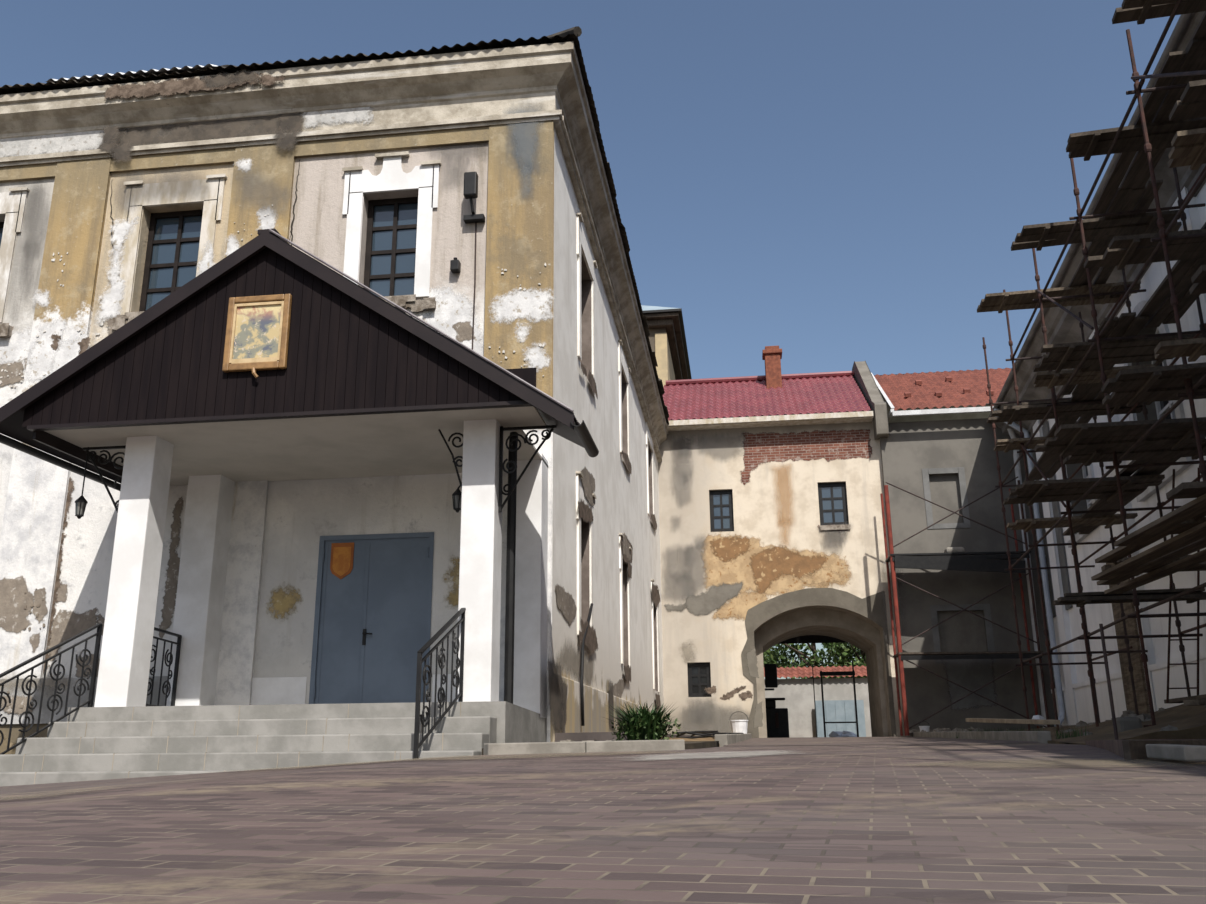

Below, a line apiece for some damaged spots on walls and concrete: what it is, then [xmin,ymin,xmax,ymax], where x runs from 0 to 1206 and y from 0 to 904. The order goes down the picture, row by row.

peeling [0,218,137,387]
peeling [423,263,553,376]
flaking render [740,429,872,485]
spalling [578,467,595,525]
spalling [0,576,105,661]
peeling [444,558,460,606]
spalling [555,585,598,654]
spalling [620,533,633,578]
spalling [652,584,687,612]
spalling [701,534,851,620]
flaking render [0,654,100,715]
spalling [607,665,631,730]